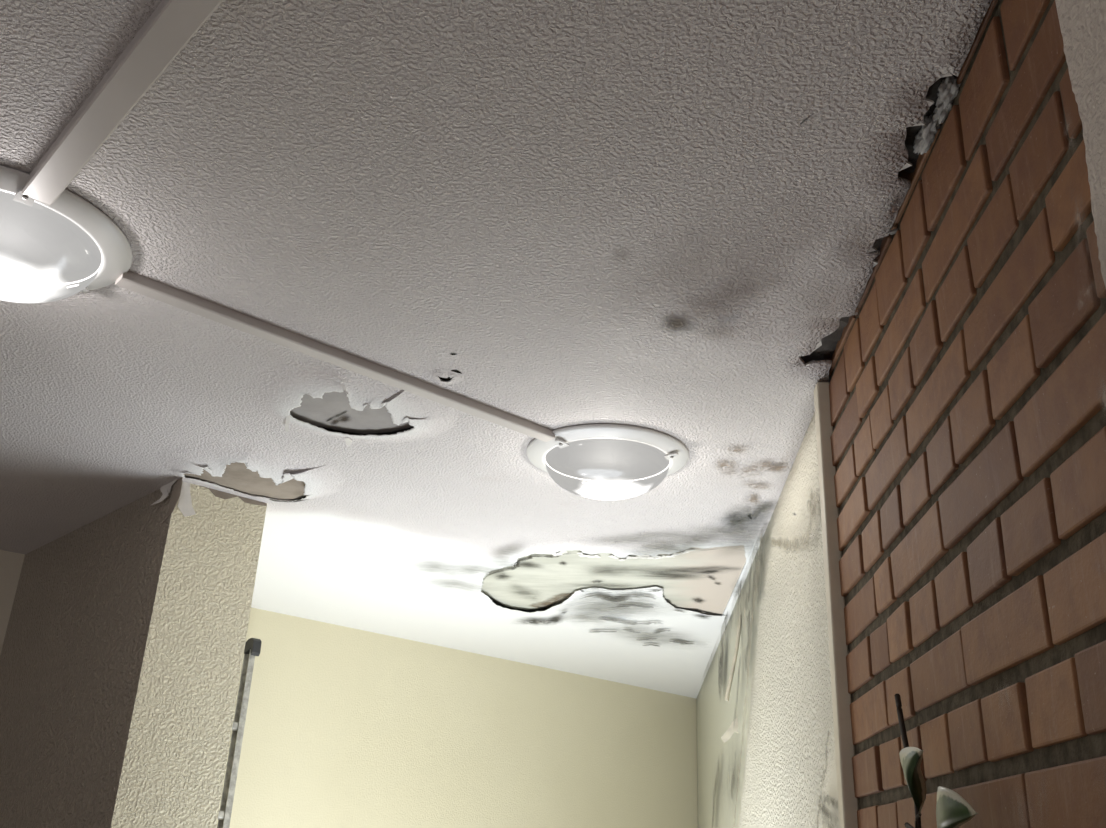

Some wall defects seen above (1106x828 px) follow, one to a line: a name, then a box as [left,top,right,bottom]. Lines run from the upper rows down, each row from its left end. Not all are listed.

spalling [900,73,960,173]
damp [667,319,686,330]
spalling [802,312,858,366]
spalling [248,361,458,446]
spalling [150,440,345,524]
damp [477,545,762,651]